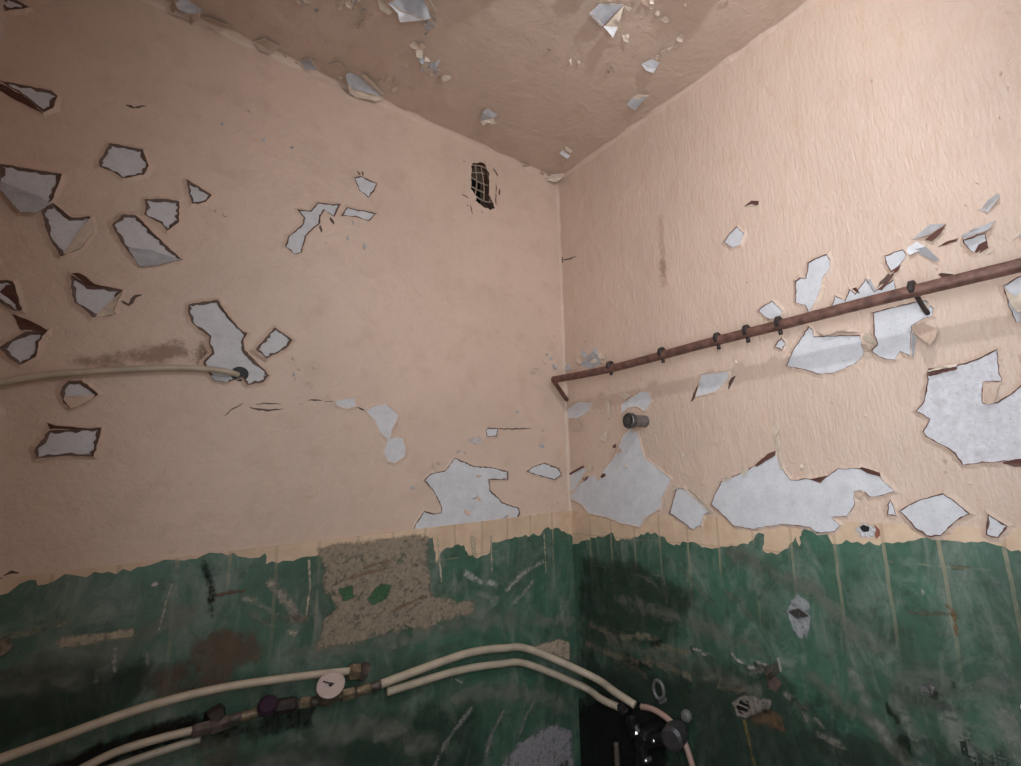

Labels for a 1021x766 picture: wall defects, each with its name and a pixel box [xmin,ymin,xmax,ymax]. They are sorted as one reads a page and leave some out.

peeling [589,0,684,73]
peeling [0,78,62,117]
peeling [0,161,227,270]
peeling [0,257,52,369]
peeling [64,271,142,322]
peeling [183,297,297,389]
peeling [756,193,1000,378]
peeling [998,273,1021,327]
peeling [29,423,107,464]
peeling [524,389,1015,542]
peeling [911,346,1021,474]
peeling [316,425,545,650]